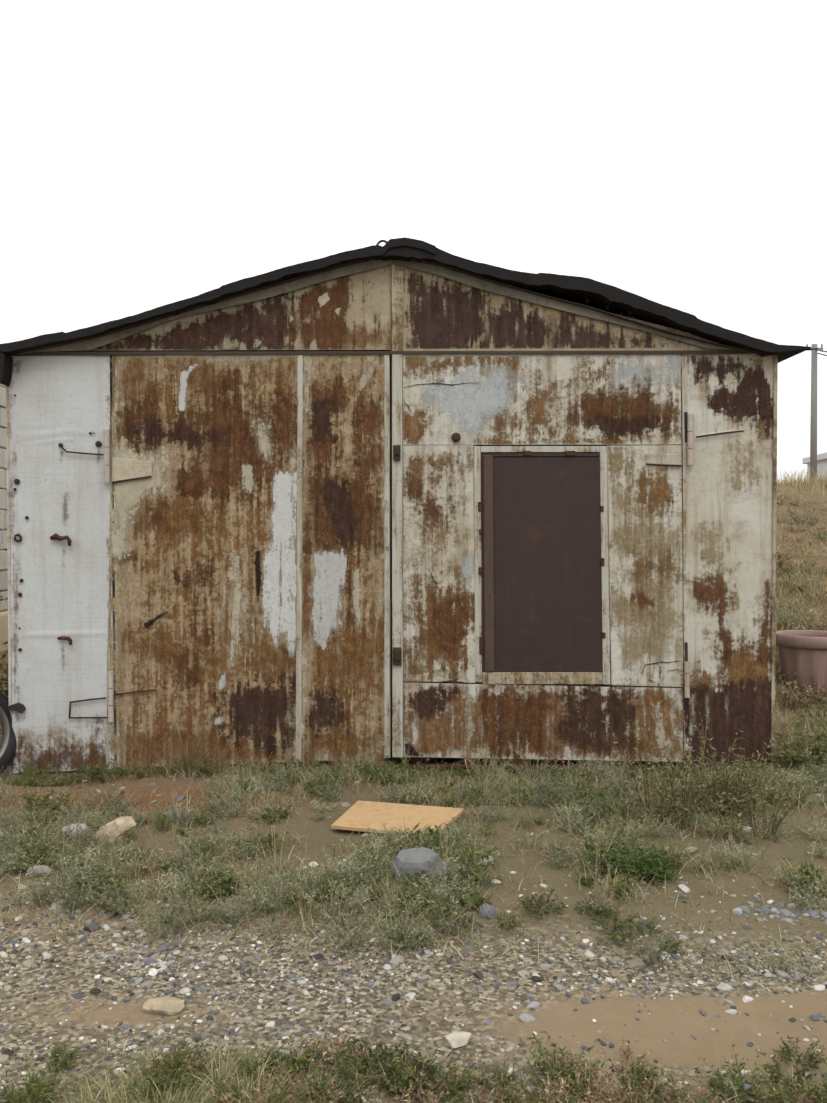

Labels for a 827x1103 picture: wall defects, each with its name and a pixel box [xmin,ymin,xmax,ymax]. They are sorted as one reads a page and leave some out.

corrosion [11,276,391,774]
corrosion [403,454,470,530]
corrosion [403,272,682,517]
corrosion [403,568,772,772]
corrosion [624,558,674,611]
corrosion [683,355,773,439]